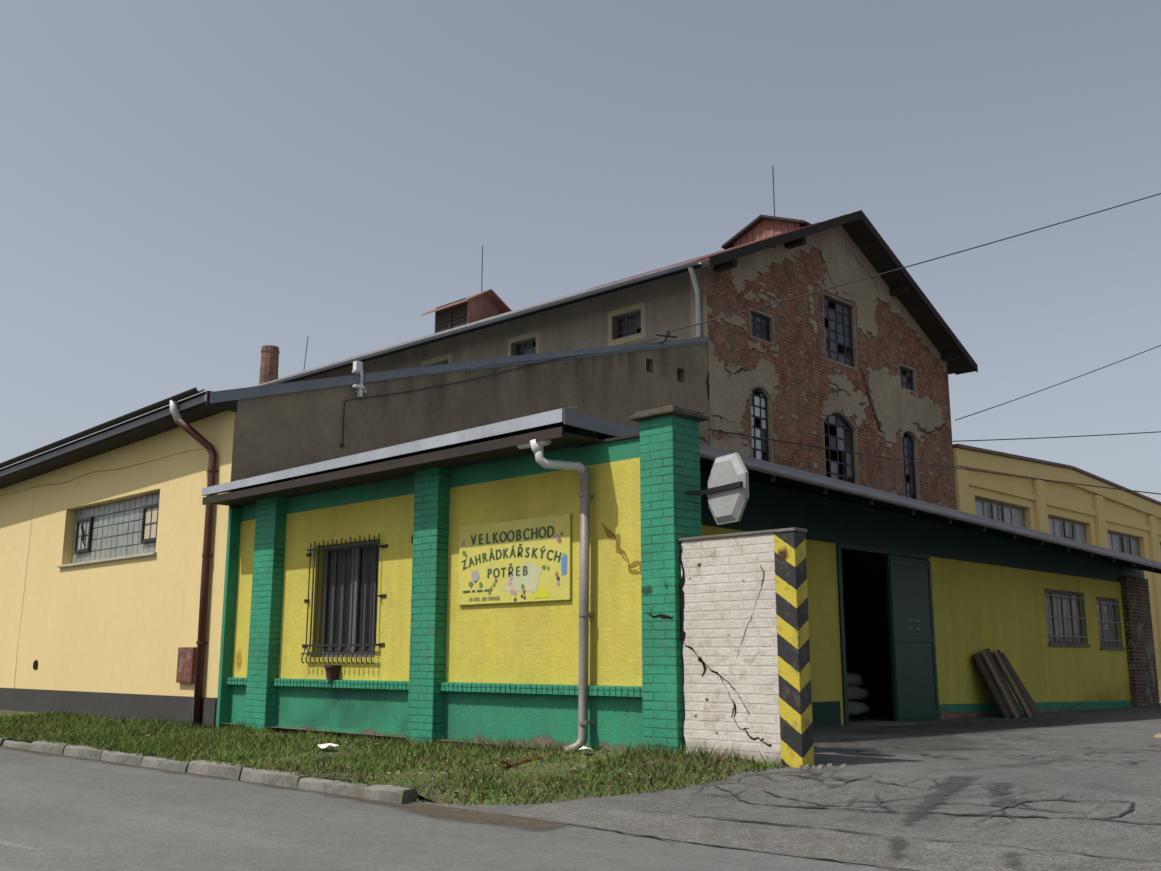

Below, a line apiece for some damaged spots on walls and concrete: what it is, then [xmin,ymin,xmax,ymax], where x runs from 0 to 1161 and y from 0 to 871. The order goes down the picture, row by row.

flaking render [707,247,957,510]
crack [602,523,641,574]
crack [648,565,1161,819]